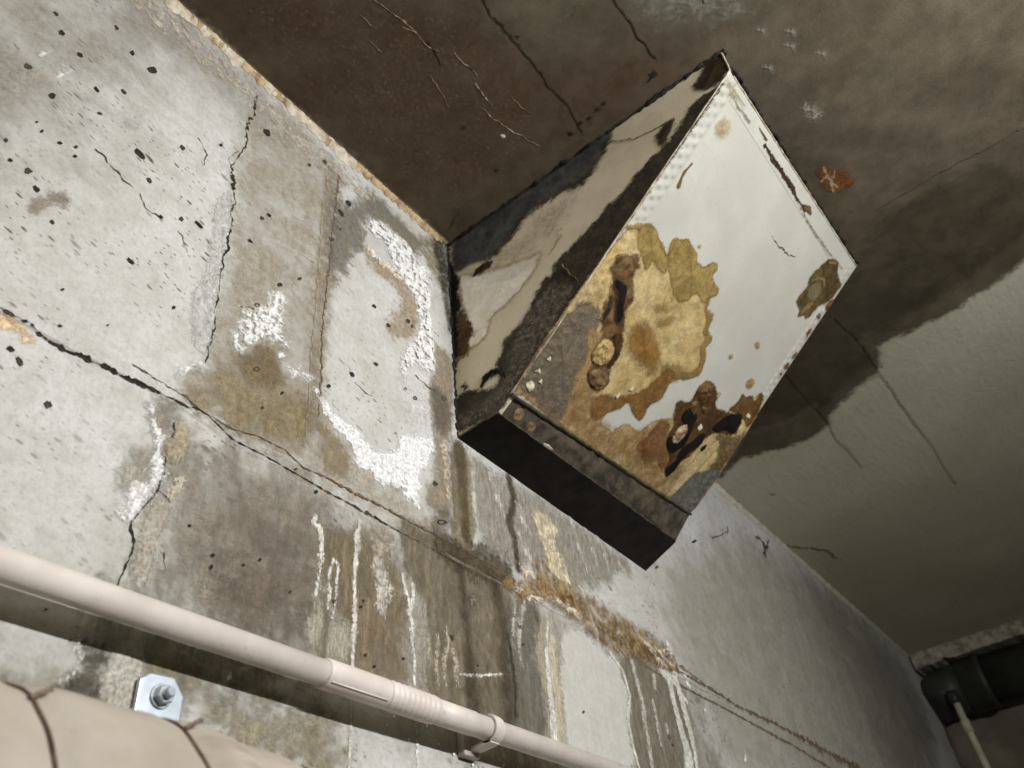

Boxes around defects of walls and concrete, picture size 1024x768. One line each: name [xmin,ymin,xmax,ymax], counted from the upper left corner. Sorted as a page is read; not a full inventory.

crack [483,0,665,144]
crack [199,95,258,361]
leakage [180,0,1024,504]
corrosion [588,254,641,391]
corrosion [816,164,854,192]
crack [0,307,489,586]
leakage [144,120,698,768]
corrosion [665,382,763,476]
corrosion [502,559,679,675]